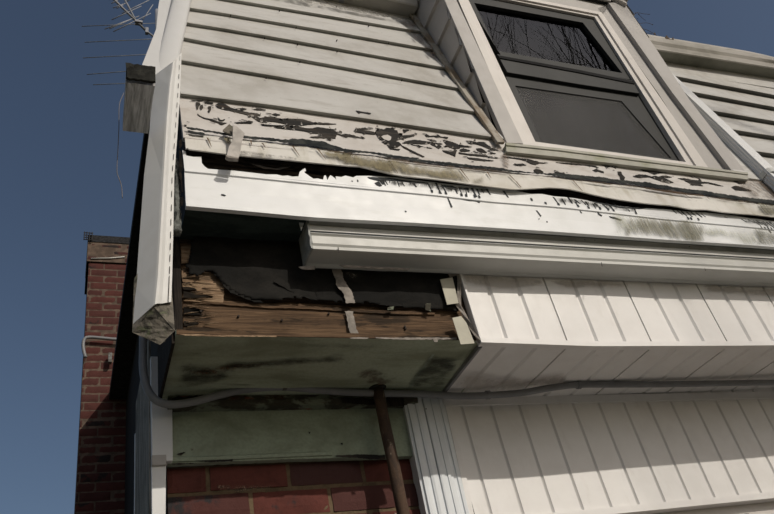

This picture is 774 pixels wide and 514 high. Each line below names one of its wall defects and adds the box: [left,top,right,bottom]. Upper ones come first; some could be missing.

peeling [191,100,721,196]
damp [545,197,706,239]
damp [742,181,774,243]
damp [183,359,334,382]